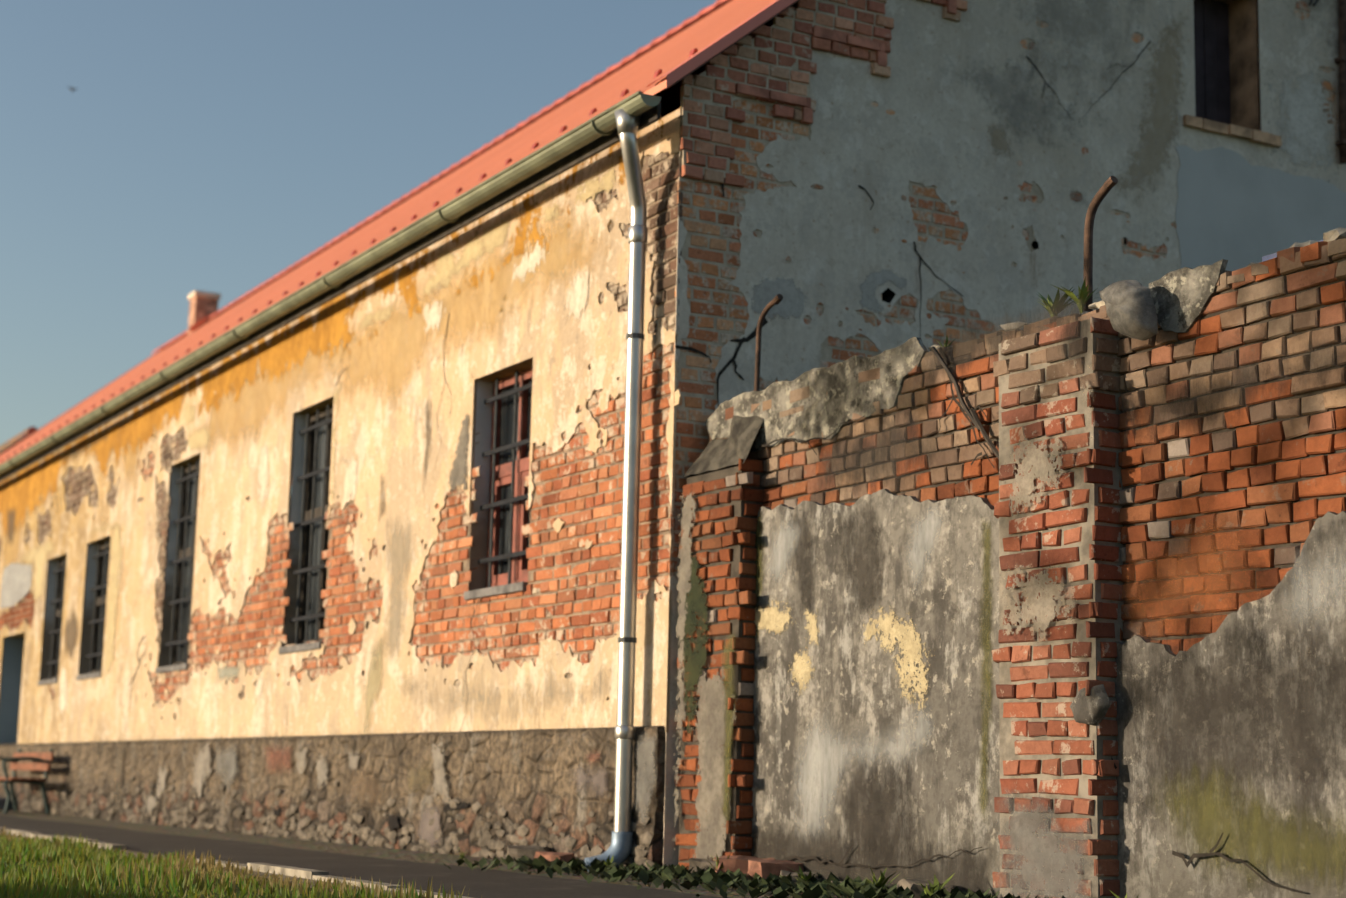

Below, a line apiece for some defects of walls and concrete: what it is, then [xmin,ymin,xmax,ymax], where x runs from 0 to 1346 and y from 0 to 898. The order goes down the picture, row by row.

peeling [422,214,512,295]
flaking render [600,282,628,312]
flaking render [637,99,808,601]
flaking render [0,591,35,631]
flaking render [25,466,118,546]
flaking render [139,426,387,719]
flaking render [409,377,625,687]
water stain [771,518,814,611]
water stain [841,510,885,613]
water stain [908,509,941,580]
water stain [1129,627,1346,803]
water stain [750,709,987,894]